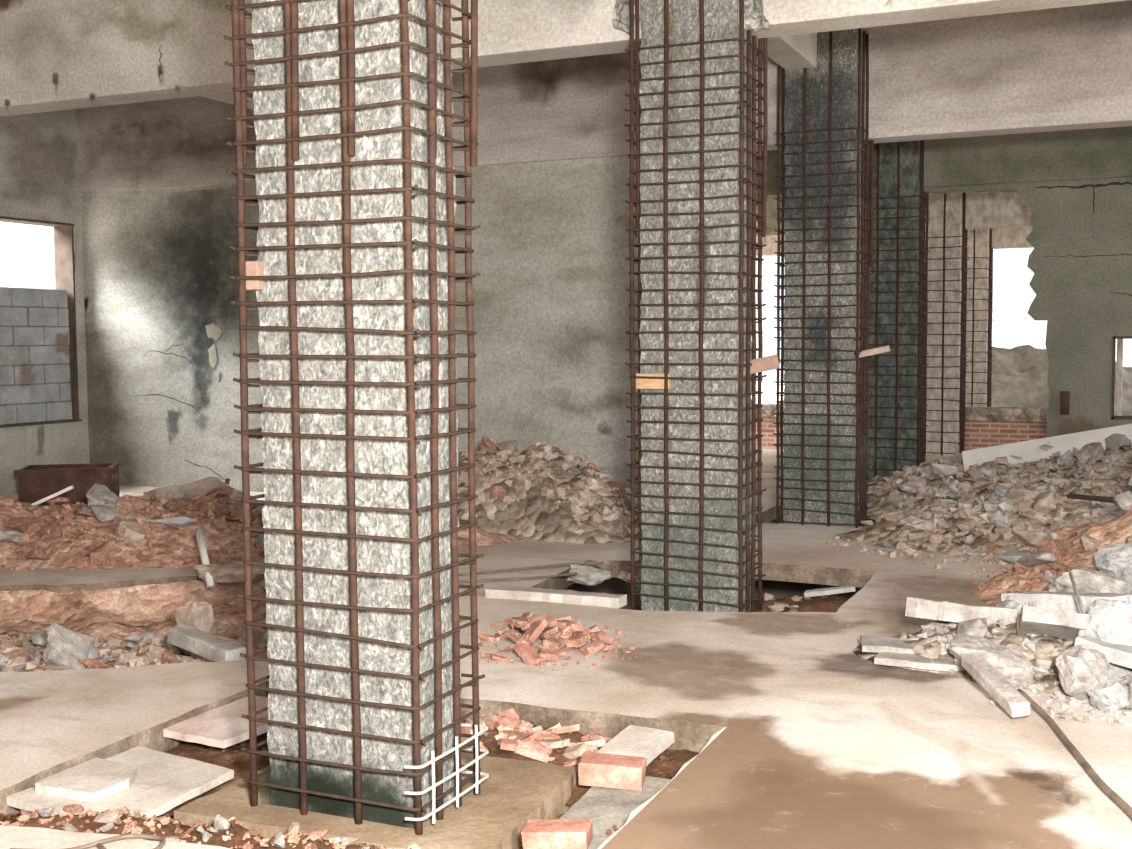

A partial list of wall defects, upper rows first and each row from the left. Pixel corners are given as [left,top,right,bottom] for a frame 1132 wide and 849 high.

spalling [612,0,635,36]
spalling [744,0,770,32]
crack [1034,181,1132,214]
crack [1044,251,1132,259]
leakage [195,322,212,405]